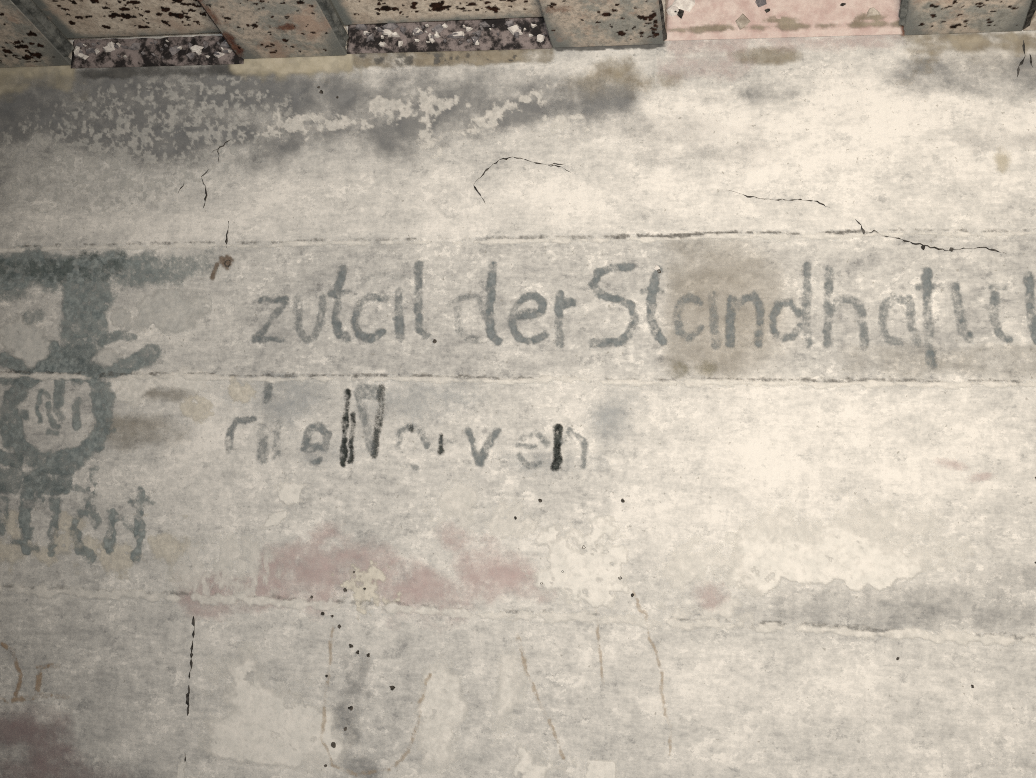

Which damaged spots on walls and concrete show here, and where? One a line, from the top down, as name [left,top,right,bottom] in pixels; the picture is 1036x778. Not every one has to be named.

water stain [723,44,795,64]
water stain [0,48,642,162]
crack [474,157,568,202]